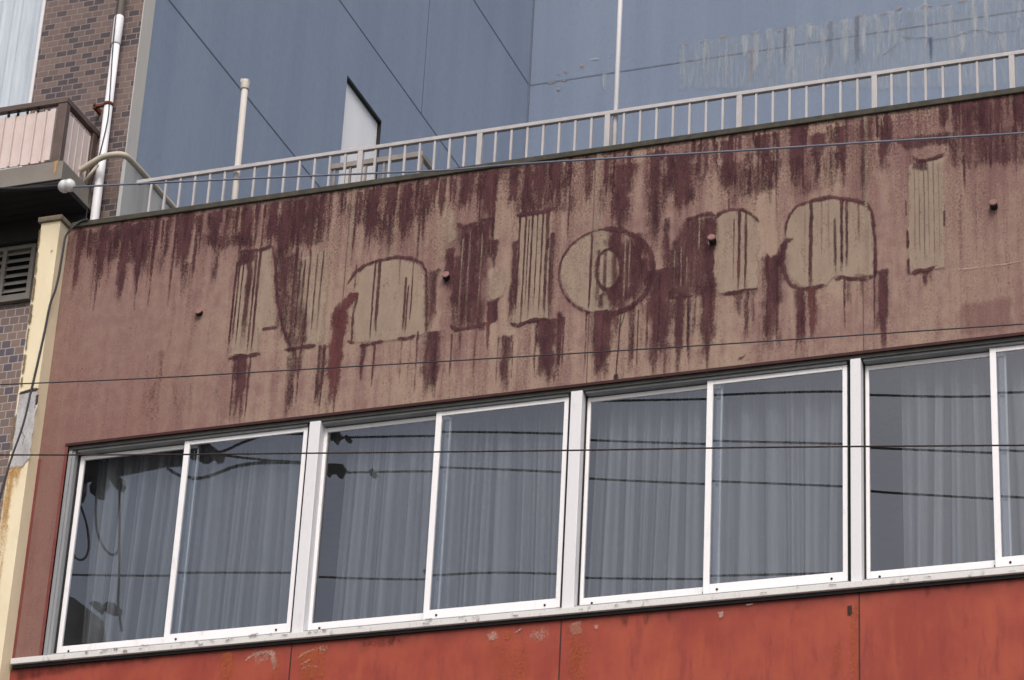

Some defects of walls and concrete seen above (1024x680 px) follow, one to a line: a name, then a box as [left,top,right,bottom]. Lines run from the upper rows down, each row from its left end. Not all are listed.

peeling [10,230,41,468]